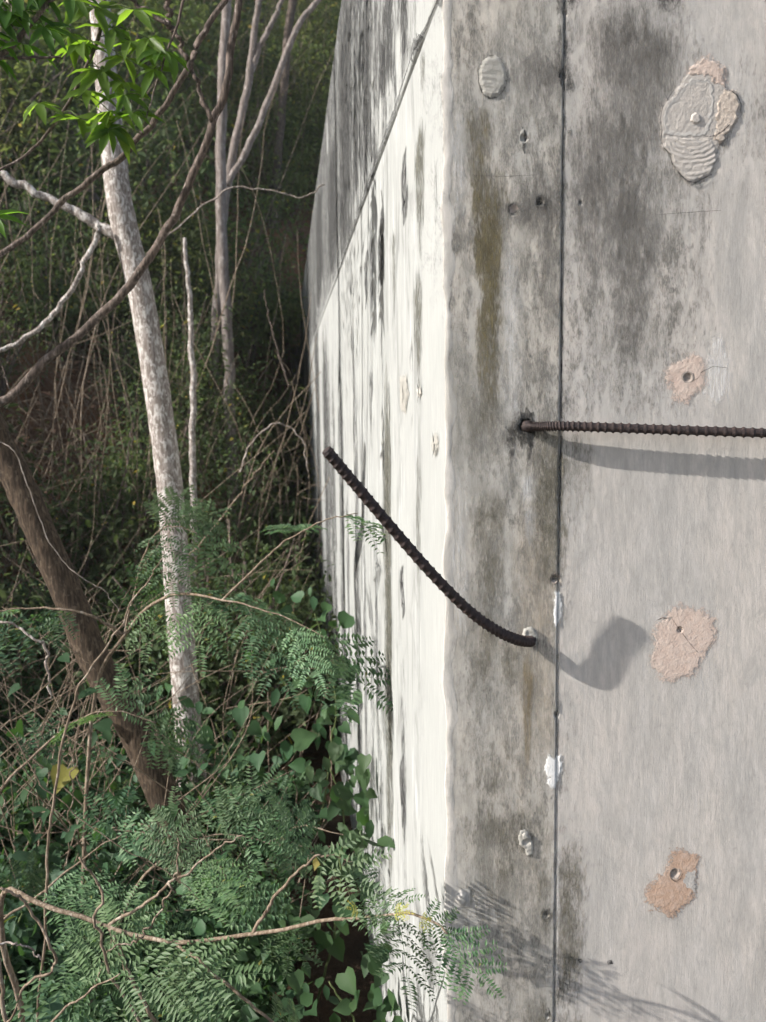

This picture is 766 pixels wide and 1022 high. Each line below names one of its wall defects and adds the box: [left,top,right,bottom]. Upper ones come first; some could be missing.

leakage [415,129,424,224]
spalling [658,54,742,184]
leakage [301,0,408,842]
leakage [411,279,422,366]
leakage [451,0,696,601]
spalling [661,352,726,405]
leakage [459,501,541,795]
spalling [649,601,717,683]
leakage [475,798,583,1021]
spalling [644,845,706,919]